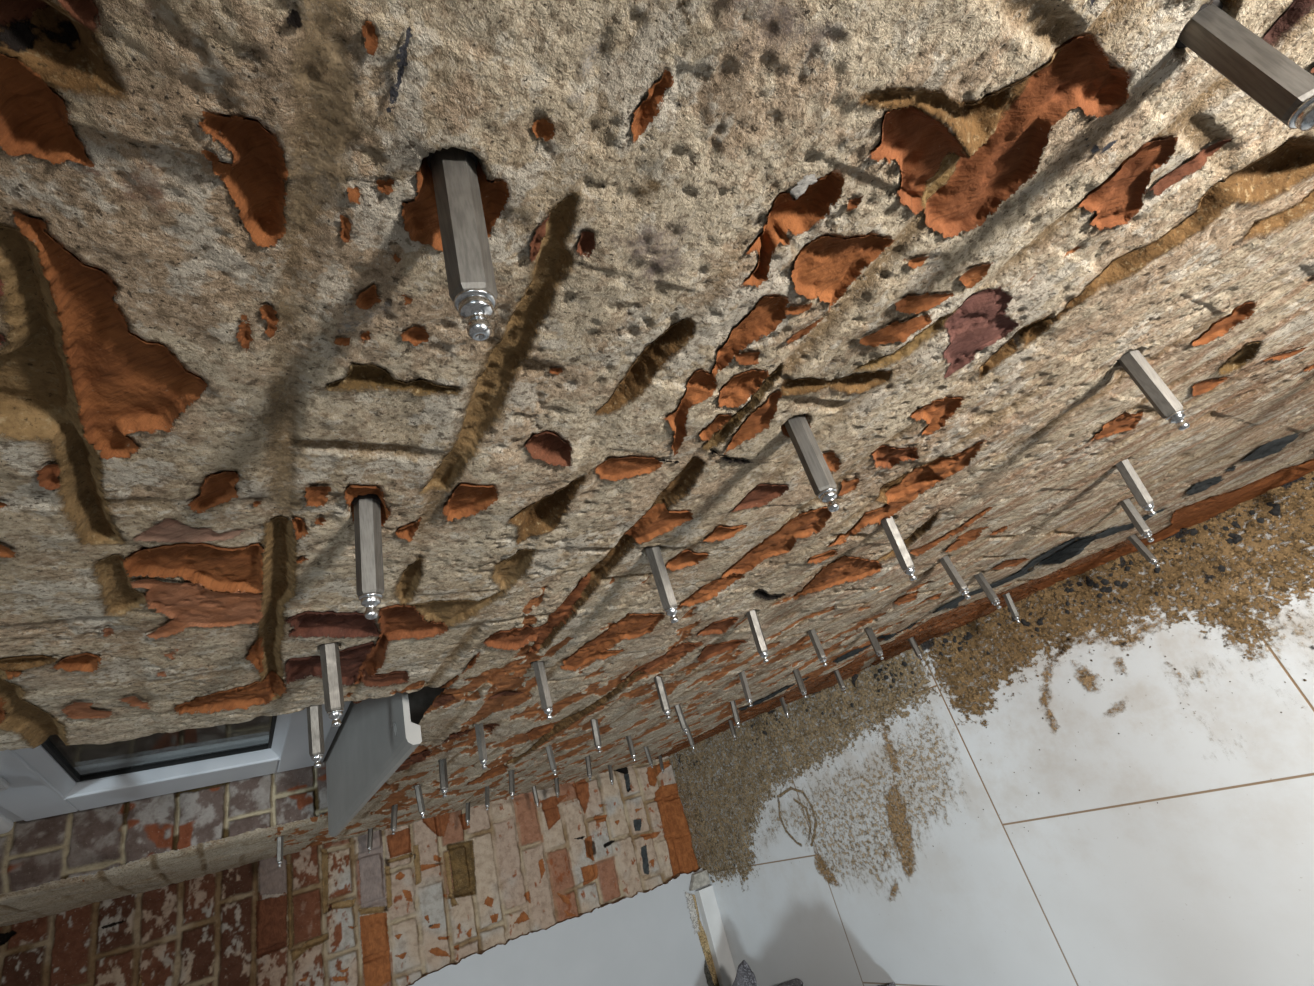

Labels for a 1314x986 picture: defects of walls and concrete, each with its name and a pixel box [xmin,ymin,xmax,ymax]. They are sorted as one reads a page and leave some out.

spalling [0,0,127,168]
spalling [198,110,289,248]
spalling [859,36,1130,238]
spalling [12,211,208,460]
spalling [594,172,894,481]
spalling [524,430,572,467]
spalling [680,397,986,607]
spalling [119,542,322,715]
spalling [284,604,449,704]
spalling [560,613,665,672]
flaking render [621,459,1314,891]
spalling [386,813,498,923]